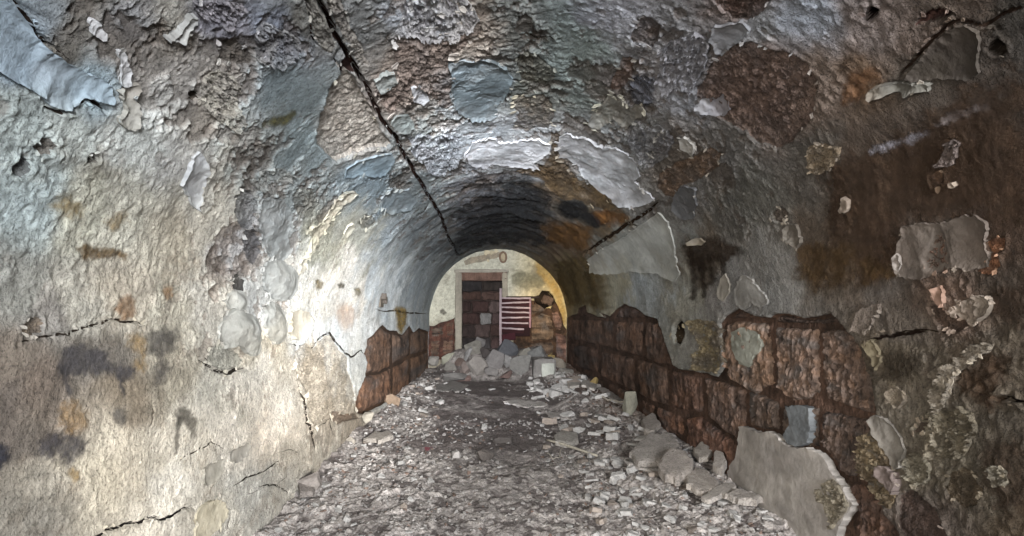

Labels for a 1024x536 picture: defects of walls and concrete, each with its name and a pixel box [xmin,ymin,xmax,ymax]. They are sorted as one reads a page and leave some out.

peeling [0,0,143,131]
peeling [305,0,482,177]
crack [901,6,1023,75]
crack [310,0,457,255]
water stain [682,238,740,300]
crack [22,308,146,342]
water stain [57,346,135,395]
flaking render [288,310,455,431]
water stain [41,435,85,462]
water stain [175,409,196,453]
flaking render [514,300,946,536]
crack [96,507,192,536]